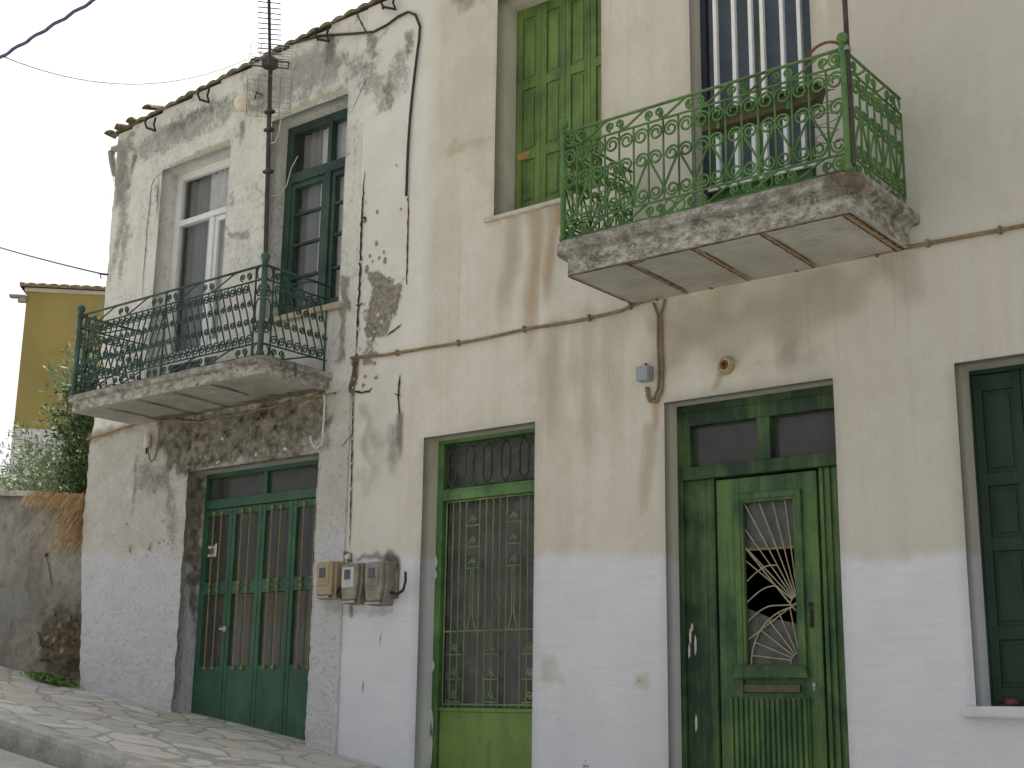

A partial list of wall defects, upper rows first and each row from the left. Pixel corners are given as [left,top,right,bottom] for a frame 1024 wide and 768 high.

damp [113,134,136,201]
damp [150,390,316,420]
crack [342,173,401,563]
spalling [361,241,404,388]
damp [164,433,223,615]
peeling [688,624,697,657]